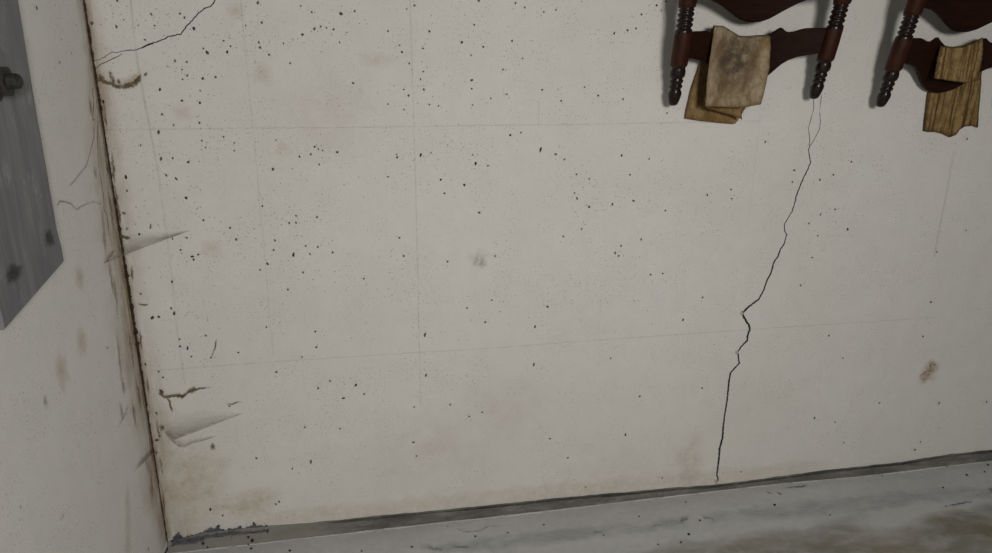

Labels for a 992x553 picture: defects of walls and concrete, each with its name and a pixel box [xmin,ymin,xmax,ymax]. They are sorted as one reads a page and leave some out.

crack [83,0,215,553]
peeling [171,522,268,546]
crack [343,95,822,522]
crack [840,461,918,471]